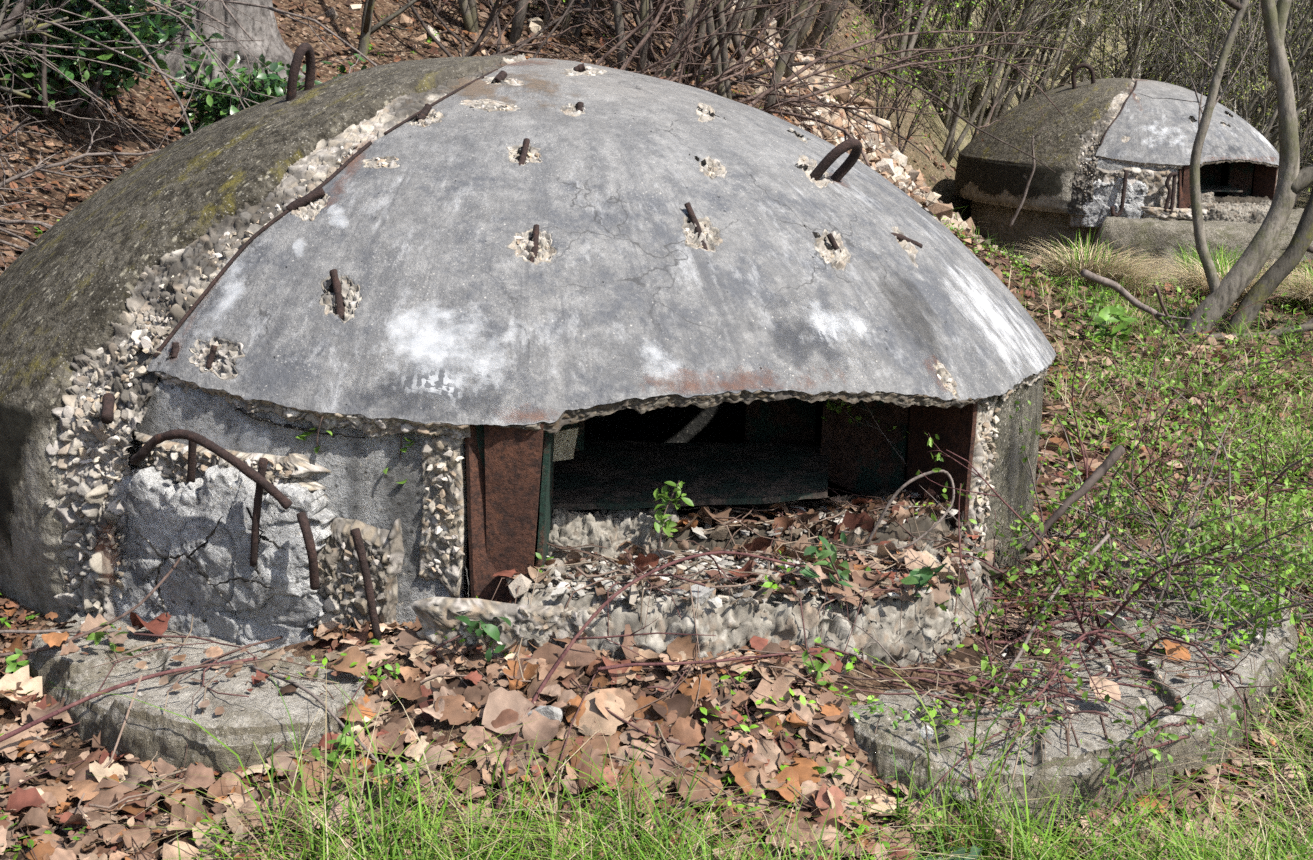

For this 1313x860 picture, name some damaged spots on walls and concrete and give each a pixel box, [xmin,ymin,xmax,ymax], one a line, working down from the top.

spalling [1066,76,1211,221]
spalling [44,53,671,662]
crack [134,507,286,617]